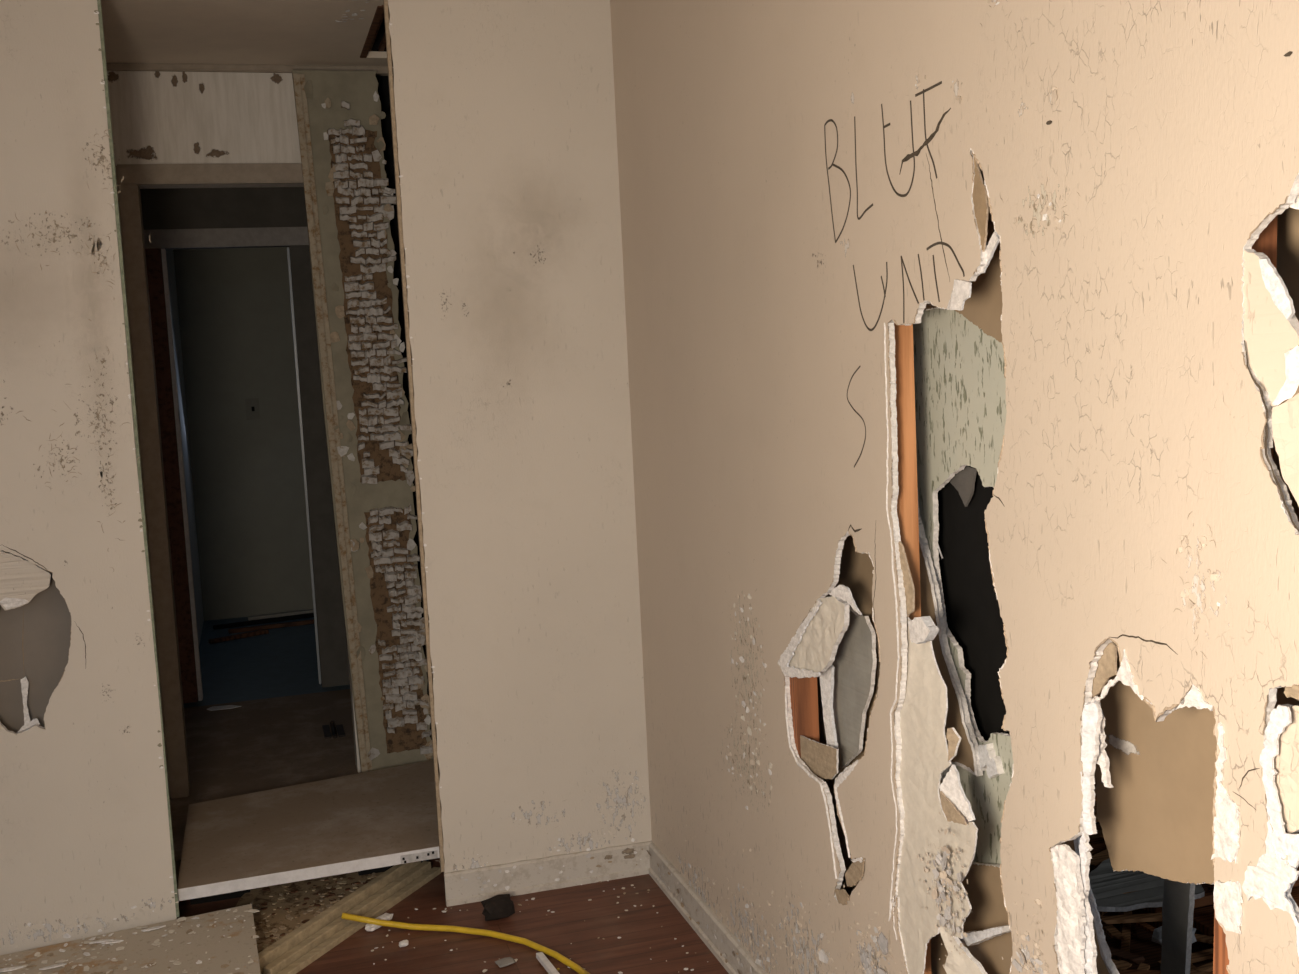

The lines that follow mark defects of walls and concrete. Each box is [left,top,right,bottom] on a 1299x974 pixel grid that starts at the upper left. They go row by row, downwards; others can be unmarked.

peeling [369,91,400,164]
spalling [0,551,66,610]
spalling [721,148,1299,974]
spalling [0,636,66,733]